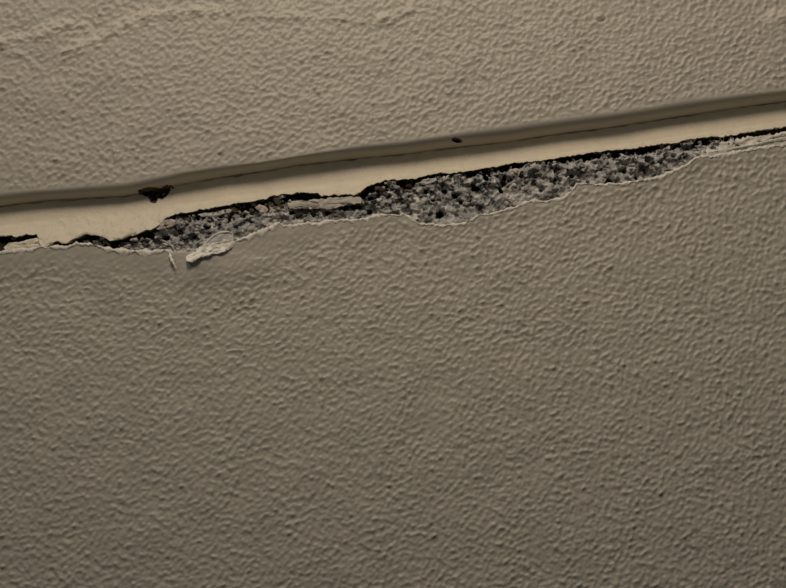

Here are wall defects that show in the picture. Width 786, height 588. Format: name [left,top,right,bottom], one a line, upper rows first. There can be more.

spalling [48,135,740,268]